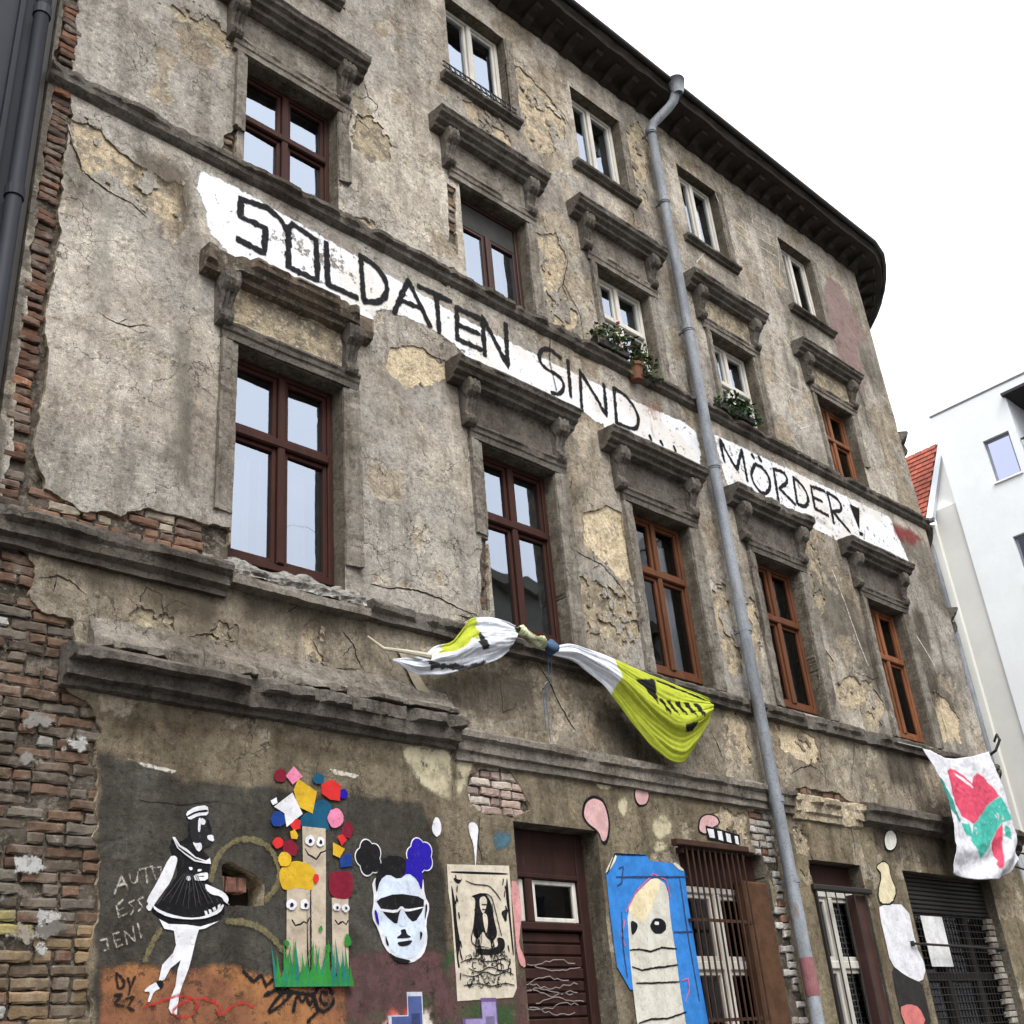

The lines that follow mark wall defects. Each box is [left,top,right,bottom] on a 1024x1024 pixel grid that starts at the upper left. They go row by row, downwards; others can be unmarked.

flaking render [54,0,82,71]
spalling [335,110,396,163]
spalling [504,64,565,156]
flaking render [0,85,228,560]
spalling [385,346,446,387]
crack [136,586,185,627]
crack [195,622,234,642]
crack [370,583,475,619]
spalling [579,505,640,646]
peeling [775,724,824,768]
flaking render [0,546,101,1024]
flaking render [467,766,528,818]